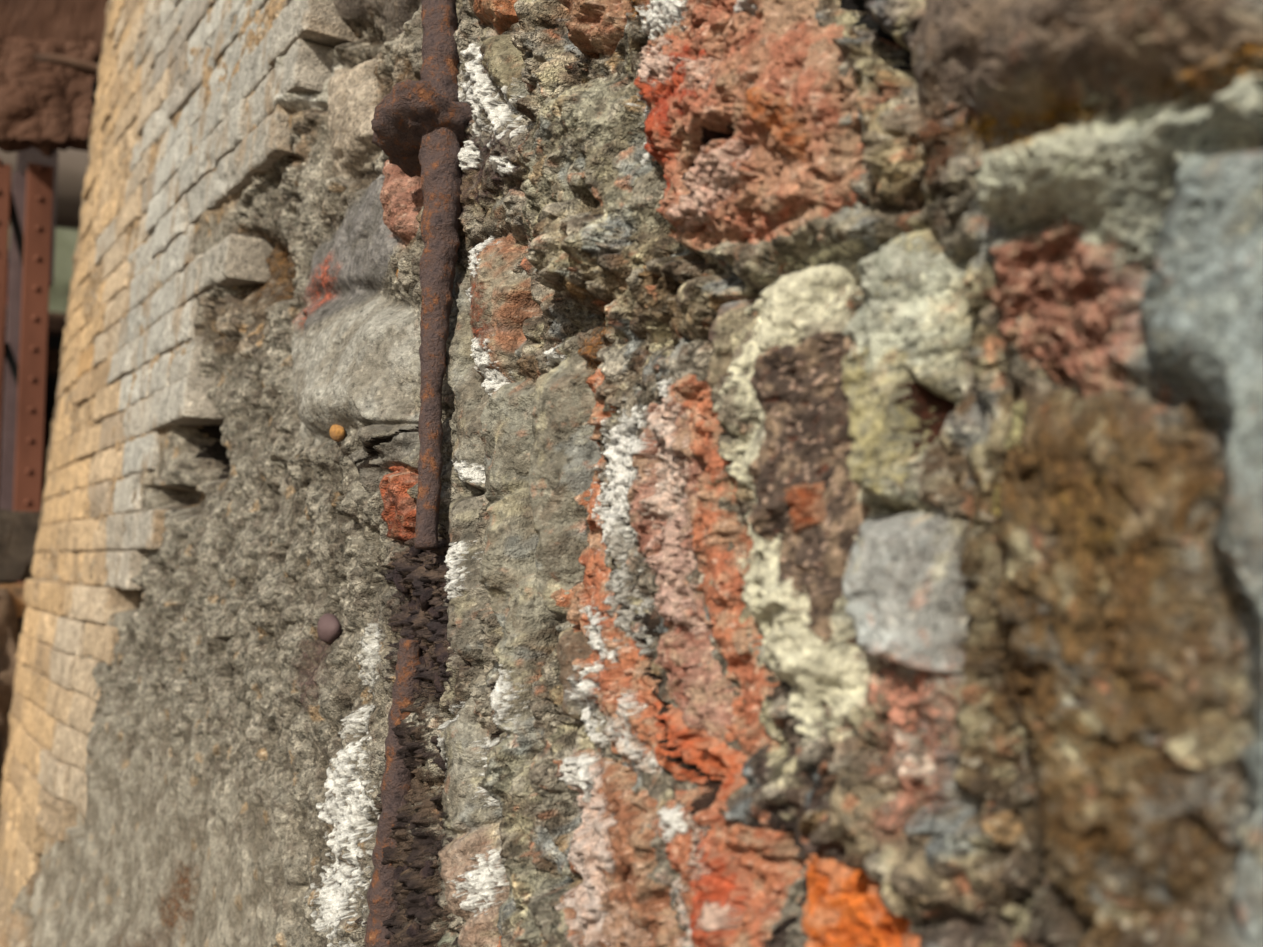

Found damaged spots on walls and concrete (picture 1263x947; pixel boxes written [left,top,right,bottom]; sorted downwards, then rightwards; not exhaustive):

leakage [457,43,534,176]
spalling [559,0,913,251]
spalling [193,425,231,480]
spalling [890,382,957,457]
spalling [988,215,1154,401]
leakage [304,620,385,947]
corrosion [380,522,471,706]
leakage [555,378,712,947]
crack [611,558,722,838]
spalling [550,331,920,947]